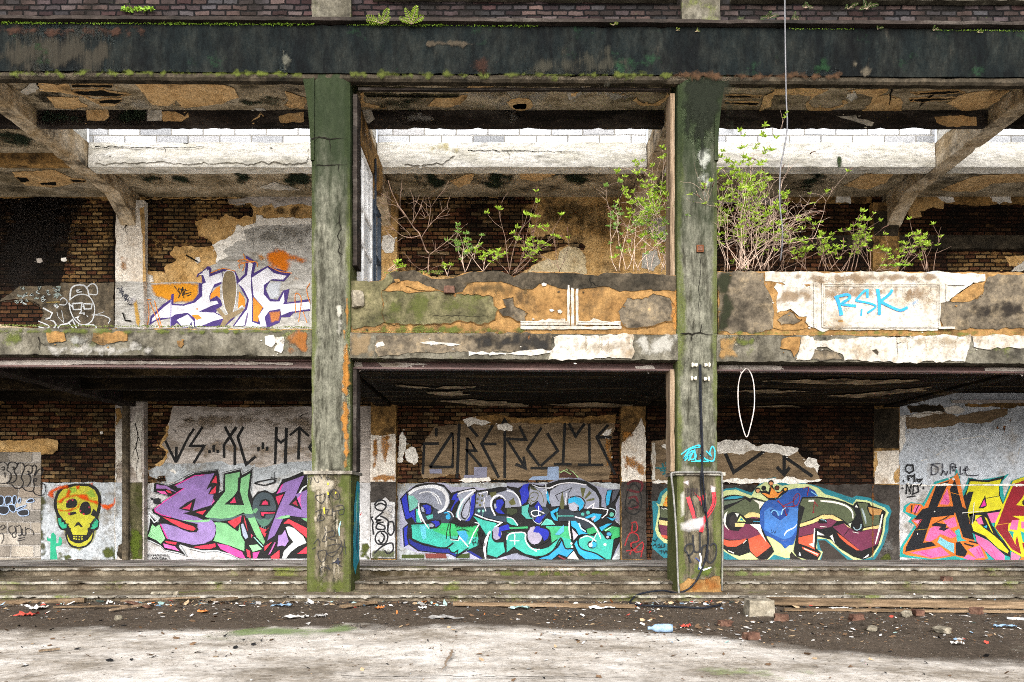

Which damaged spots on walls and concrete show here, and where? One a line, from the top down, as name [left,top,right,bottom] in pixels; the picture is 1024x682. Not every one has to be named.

damp [7,35,107,70]
flaking render [20,83,239,124]
flaking render [279,91,307,123]
damp [684,104,714,166]
flaking render [139,182,312,283]
flaking render [365,173,676,369]
flaking render [717,251,1024,363]
flaking render [0,439,58,455]
efflorescence [312,470,333,503]
rust [341,346,349,466]
flaking render [396,385,633,486]
flaking render [717,365,1024,487]